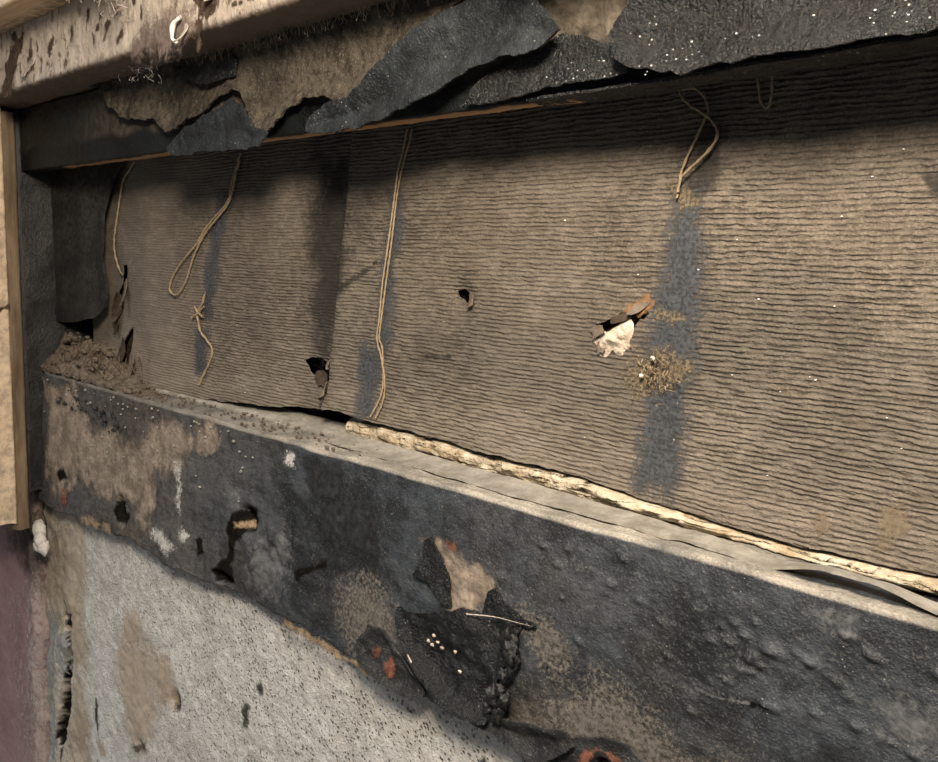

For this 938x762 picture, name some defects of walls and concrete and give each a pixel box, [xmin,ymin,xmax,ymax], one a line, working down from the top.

peeling [2,25,35,98]
peeling [175,0,219,52]
damp [310,163,348,350]
damp [628,128,721,508]
corrosion [372,646,396,678]
corrosion [578,748,621,762]